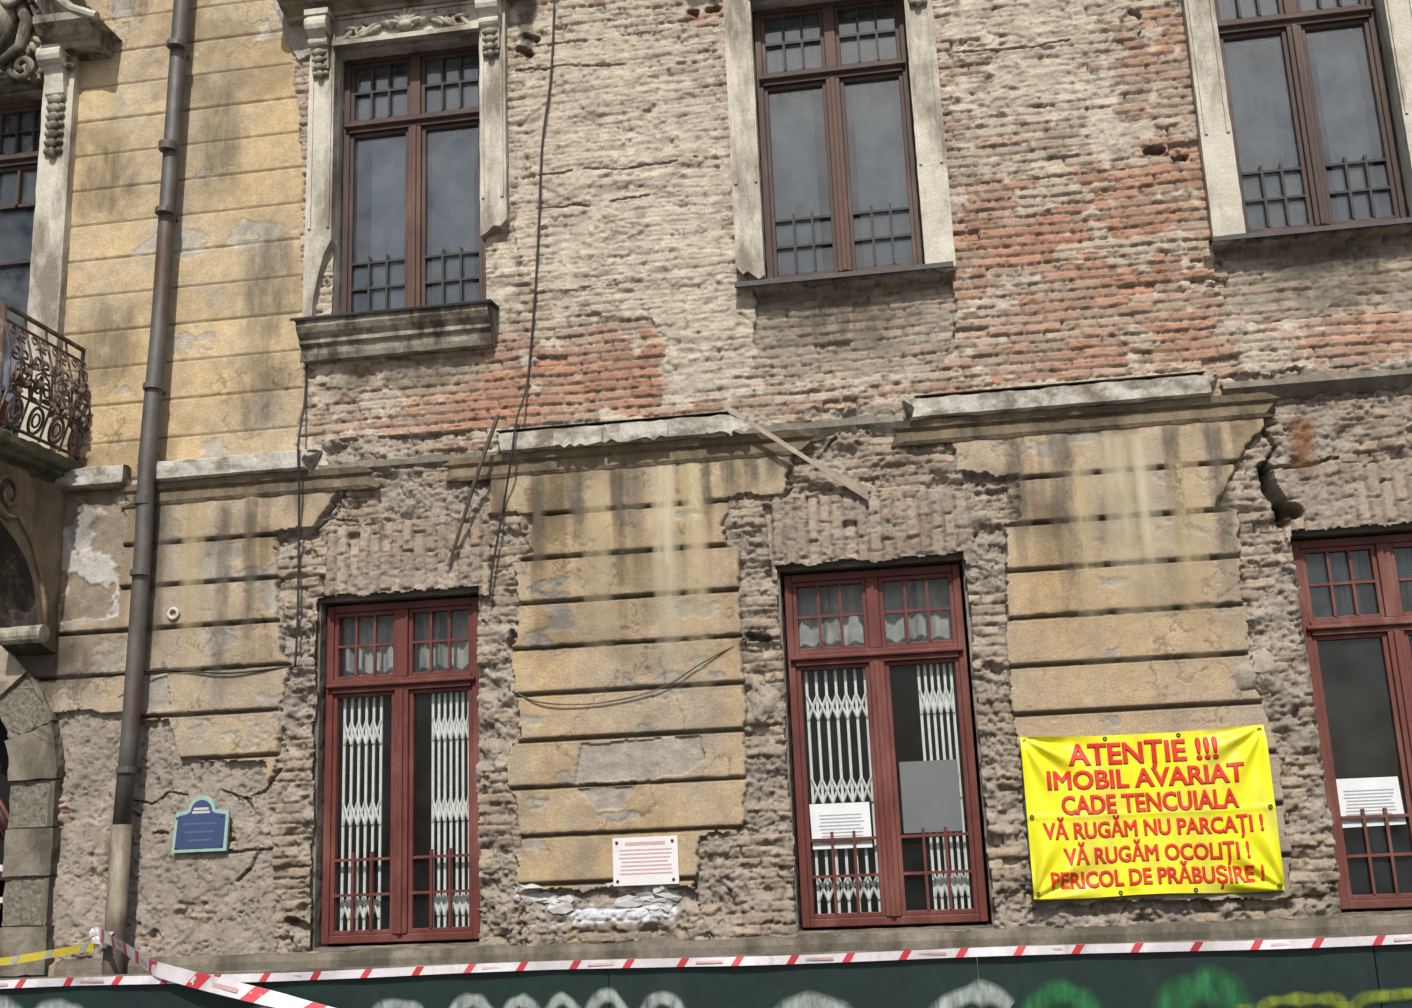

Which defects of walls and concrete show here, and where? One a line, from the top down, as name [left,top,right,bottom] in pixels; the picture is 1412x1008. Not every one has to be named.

flaking render [526,0,724,46]
flaking render [948,161,1412,391]
flaking render [60,487,128,622]
water stain [658,464,672,563]
water stain [689,455,774,531]
water stain [1117,436,1149,535]
water stain [1206,428,1228,504]
crack [1262,425,1340,470]
flaking render [125,282,1412,958]
flaking render [47,708,122,962]
crack [134,768,283,839]
crack [229,847,274,881]